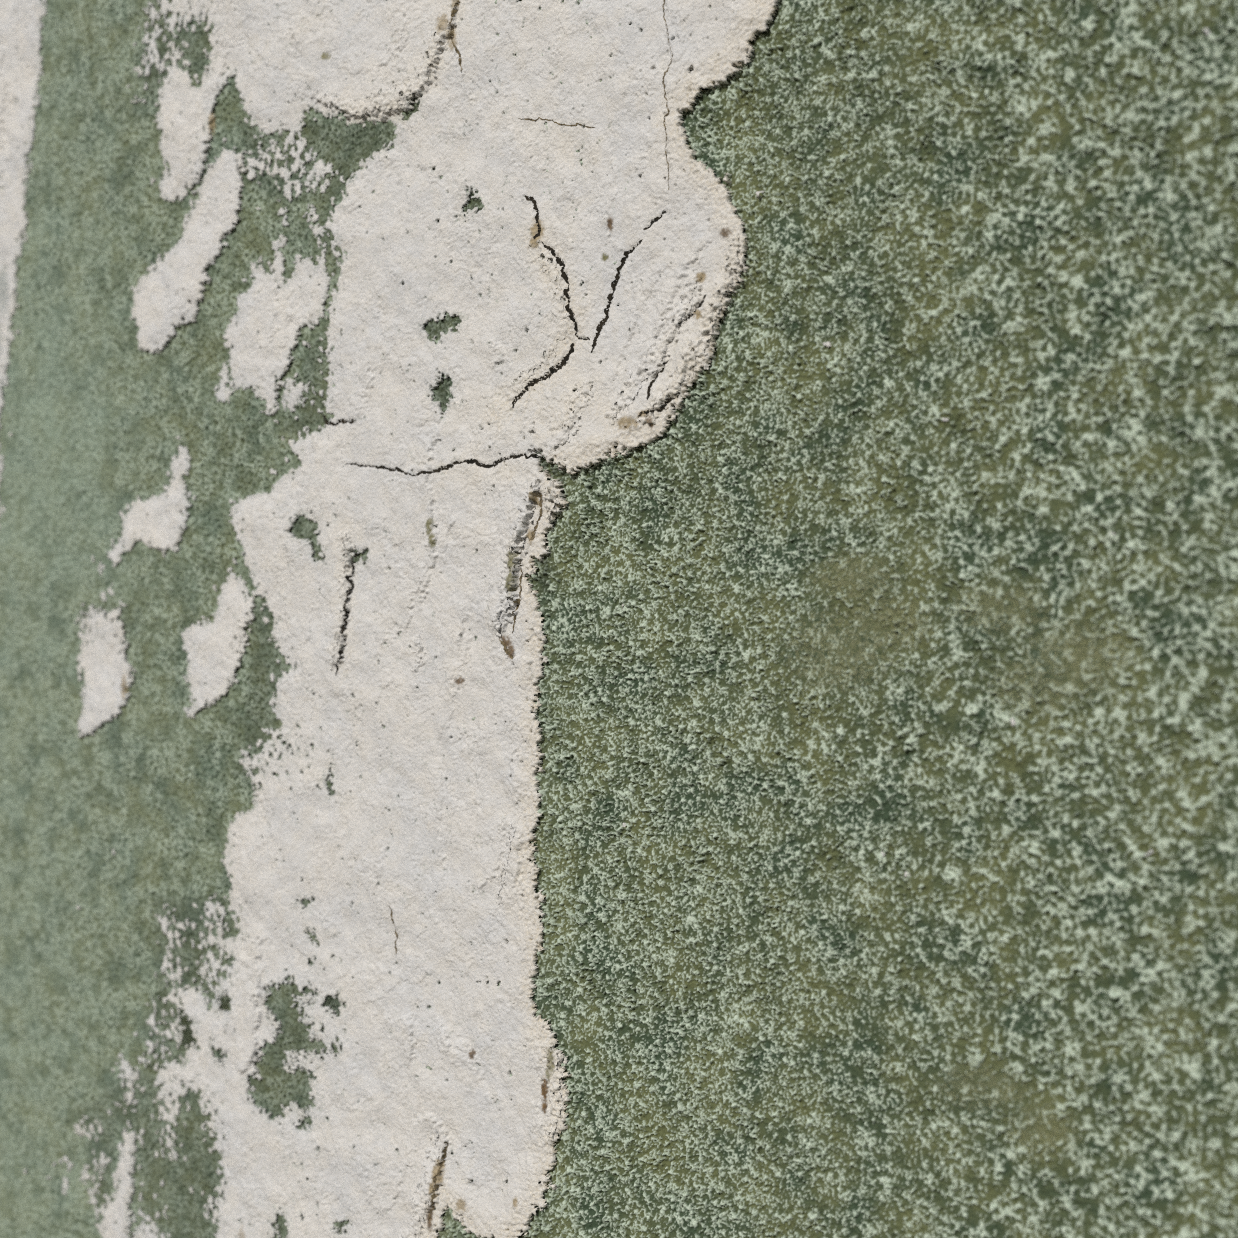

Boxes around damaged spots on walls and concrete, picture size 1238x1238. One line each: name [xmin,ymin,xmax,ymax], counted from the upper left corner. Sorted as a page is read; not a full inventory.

spalling [127,0,214,109]
spalling [233,97,420,441]
crack [512,0,673,409]
flaking render [106,445,192,568]
spalling [289,513,325,562]
crack [346,453,544,476]
crack [500,490,543,660]
flaking render [74,583,137,738]
spalling [229,587,314,790]
spalling [73,888,240,1238]
spalling [249,976,346,1131]
spalling [273,1213,288,1238]